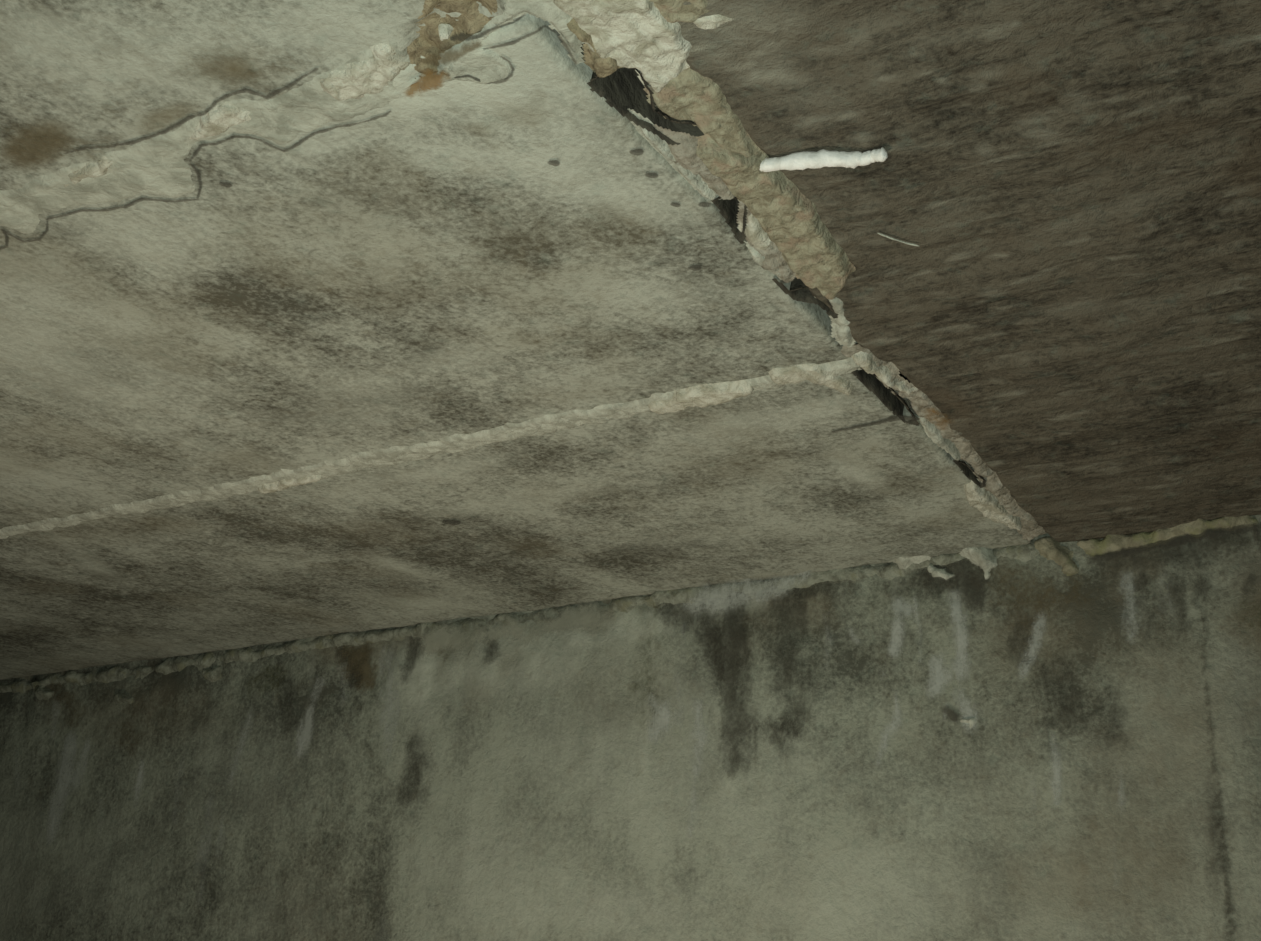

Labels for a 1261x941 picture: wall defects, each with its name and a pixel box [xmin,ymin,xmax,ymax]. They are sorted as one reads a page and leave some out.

spalling [320,0,498,101]
crack [441,18,575,84]
crack [0,69,391,250]
spalling [553,0,1046,542]
crack [832,416,918,432]
damp [666,592,756,764]
damp [889,600,917,655]
damp [919,558,985,695]